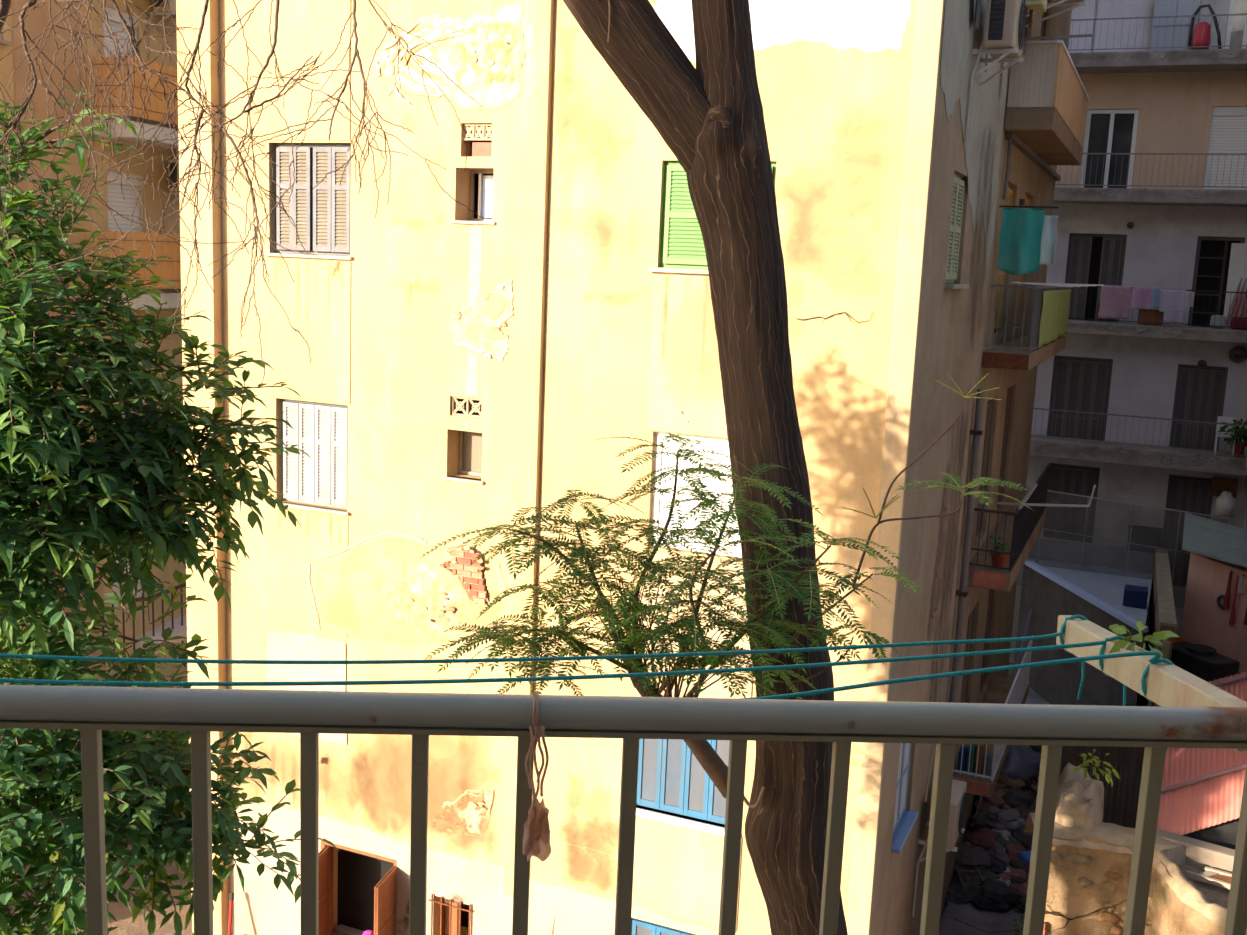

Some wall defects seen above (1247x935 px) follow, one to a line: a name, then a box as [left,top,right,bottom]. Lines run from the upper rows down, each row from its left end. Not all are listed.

flaking render [374,4,525,111]
flaking render [450,280,514,361]
crack [797,310,876,325]
flaking render [445,545,488,604]
flaking render [428,786,495,842]
crack [950,900,1127,933]